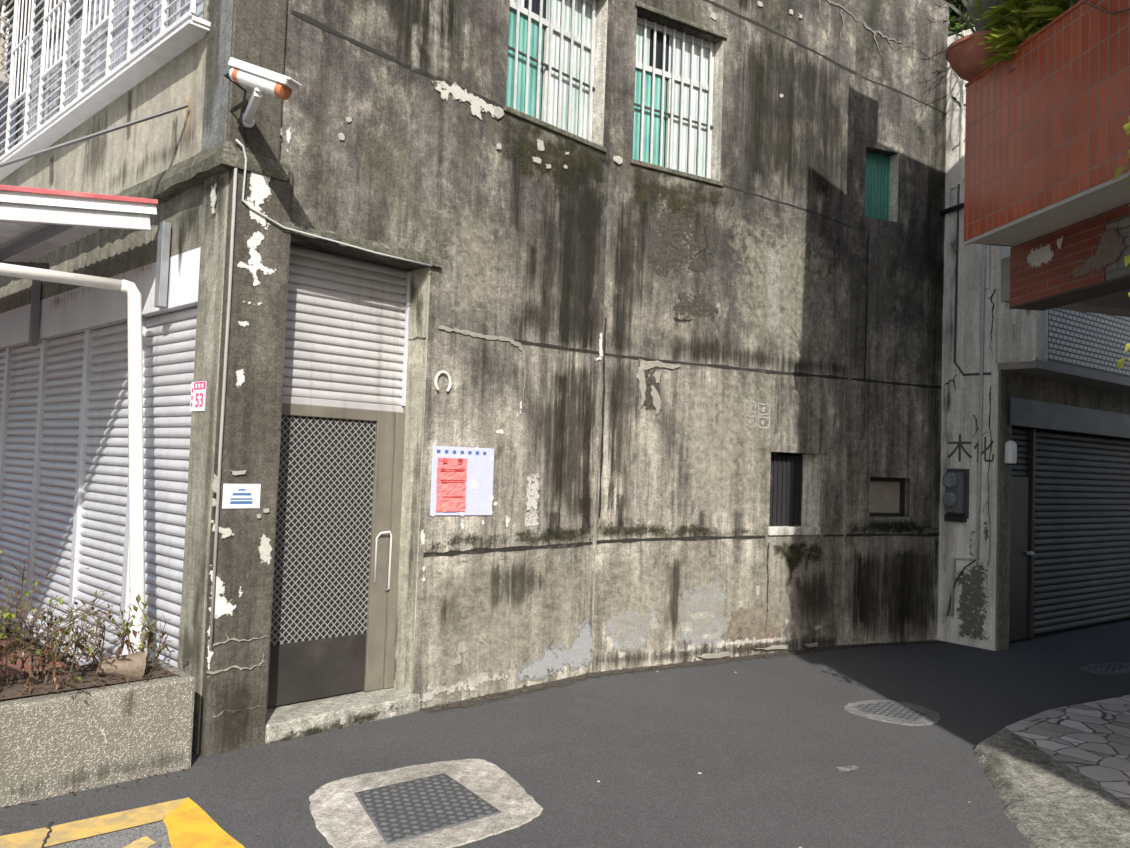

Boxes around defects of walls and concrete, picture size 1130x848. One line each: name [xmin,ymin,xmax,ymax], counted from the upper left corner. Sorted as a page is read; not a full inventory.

flaking render [432,80,504,120]
leakage [743,41,845,193]
peeling [237,172,276,286]
leakage [525,168,647,361]
leakage [924,44,956,438]
spalling [1026,236,1063,268]
peeling [236,369,245,386]
crack [987,289,995,355]
leakage [427,358,755,554]
crack [973,386,992,618]
leakage [666,561,679,633]
leakage [596,637,834,664]